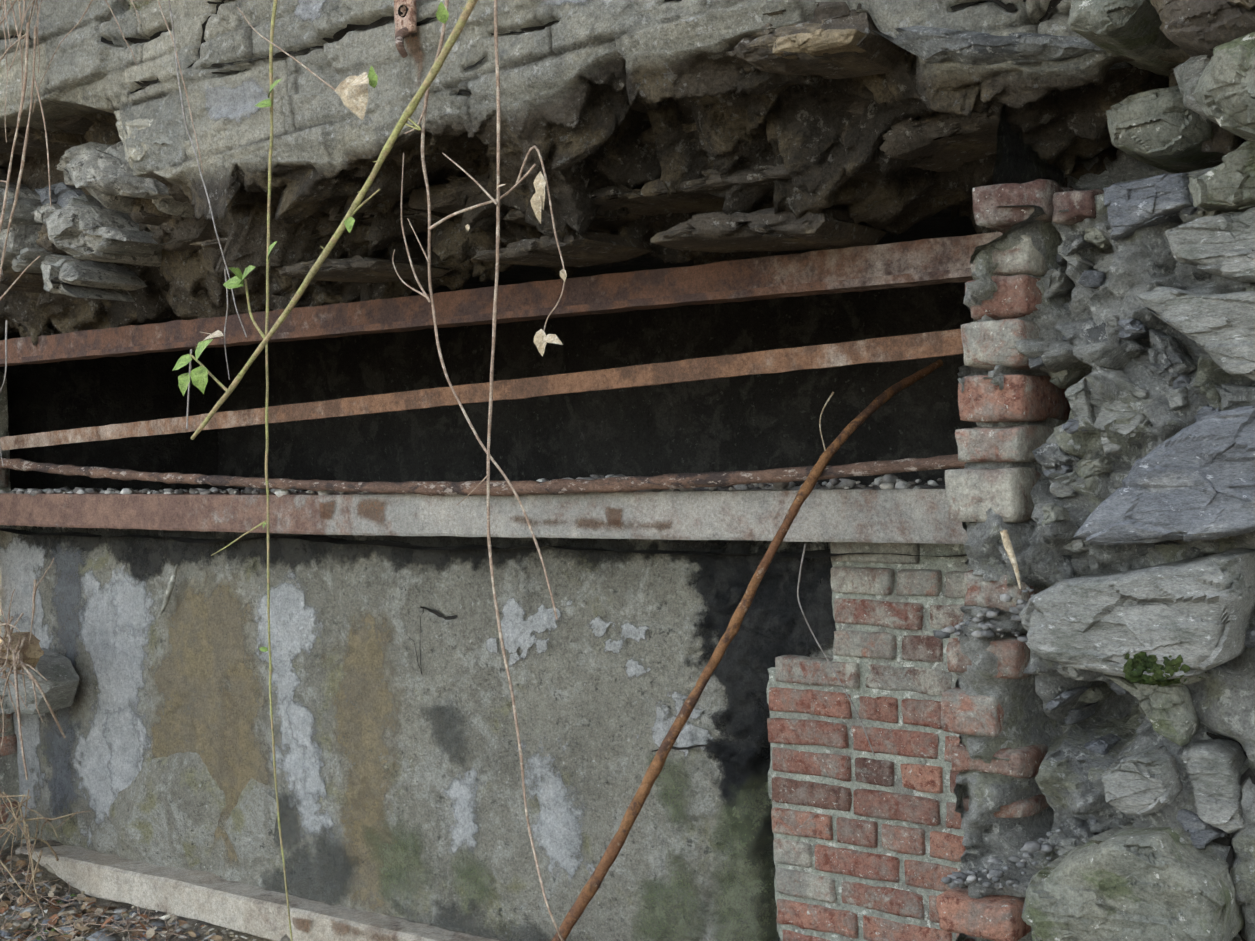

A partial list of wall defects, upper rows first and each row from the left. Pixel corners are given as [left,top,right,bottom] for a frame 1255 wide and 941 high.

rust [404,32,423,77]
rust [320,501,335,519]
rust [358,499,384,522]
rust [576,507,669,530]
spalling [0,647,79,715]
damp [424,707,462,761]
efflorescence [517,743,595,878]
damp [649,757,688,823]
damp [704,691,780,941]
damp [406,768,549,941]
rust [293,918,311,932]